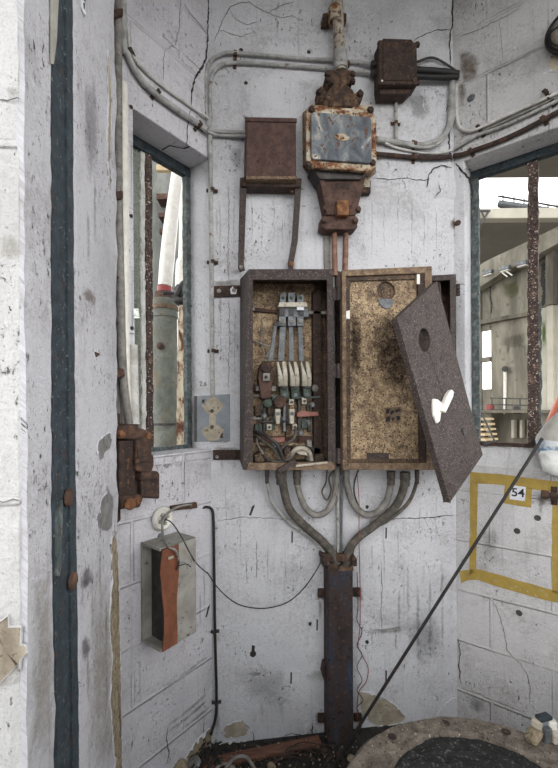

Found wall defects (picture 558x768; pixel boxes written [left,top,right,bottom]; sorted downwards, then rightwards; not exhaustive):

crack [162,0,303,150]
peeling [96,432,113,461]
flaking render [96,487,123,768]
peeling [185,719,250,761]
flaking render [358,690,406,727]
crack [458,597,531,714]